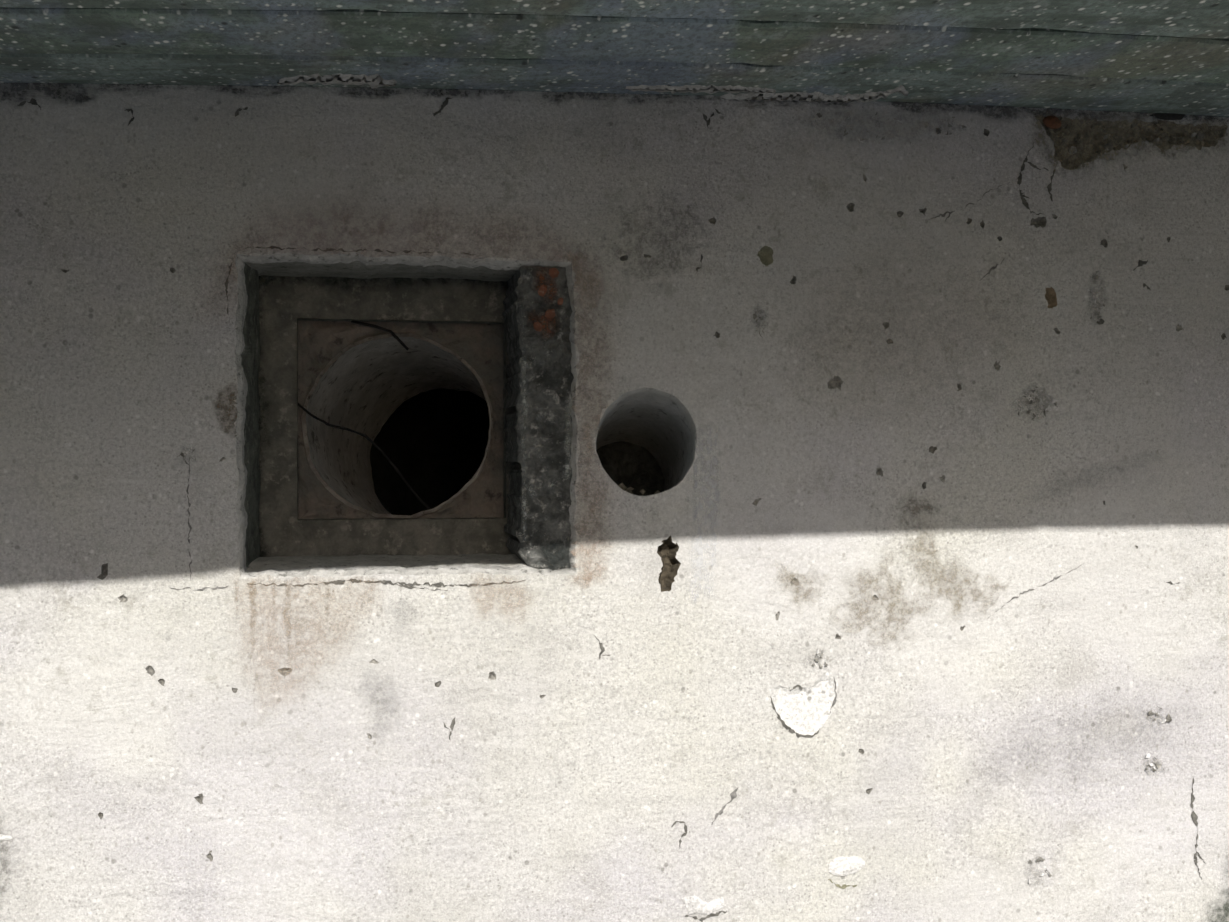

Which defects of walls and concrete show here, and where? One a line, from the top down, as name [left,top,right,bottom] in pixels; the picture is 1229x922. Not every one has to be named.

spalling [1034,113,1228,170]
crack [931,140,1055,221]
spalling [657,536,681,592]
peeling [769,671,837,738]